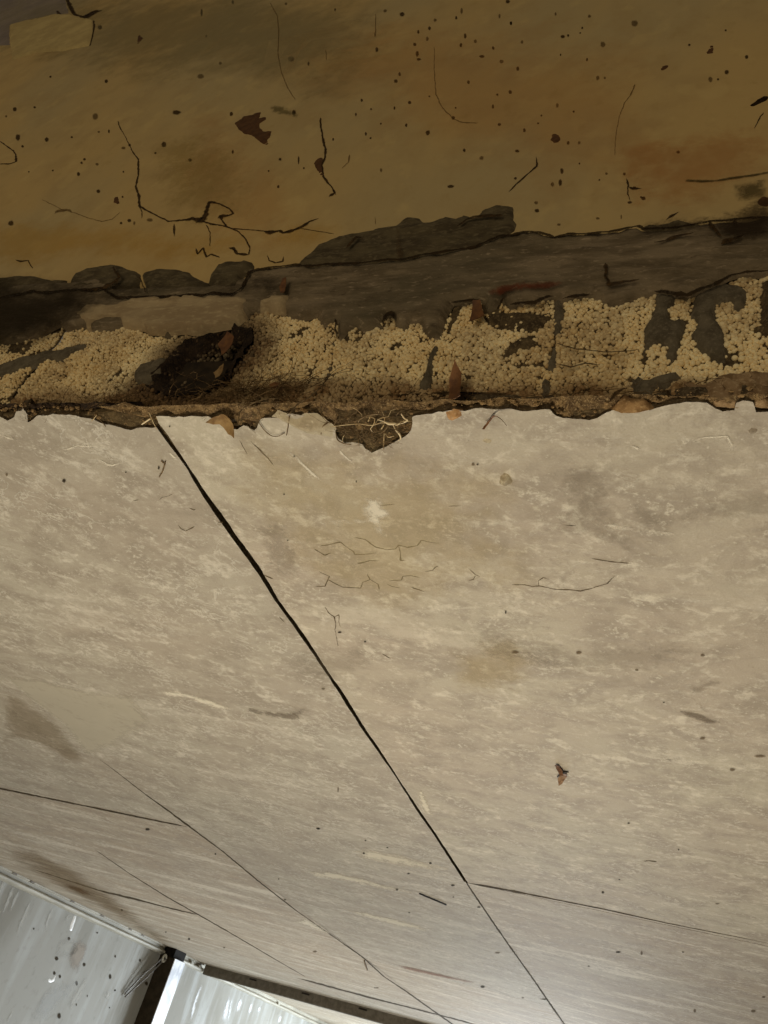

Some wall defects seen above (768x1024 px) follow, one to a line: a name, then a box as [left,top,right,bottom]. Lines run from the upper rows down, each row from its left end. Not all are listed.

crack [14,118,743,299]
spalling [0,276,768,449]
crack [315,537,439,644]